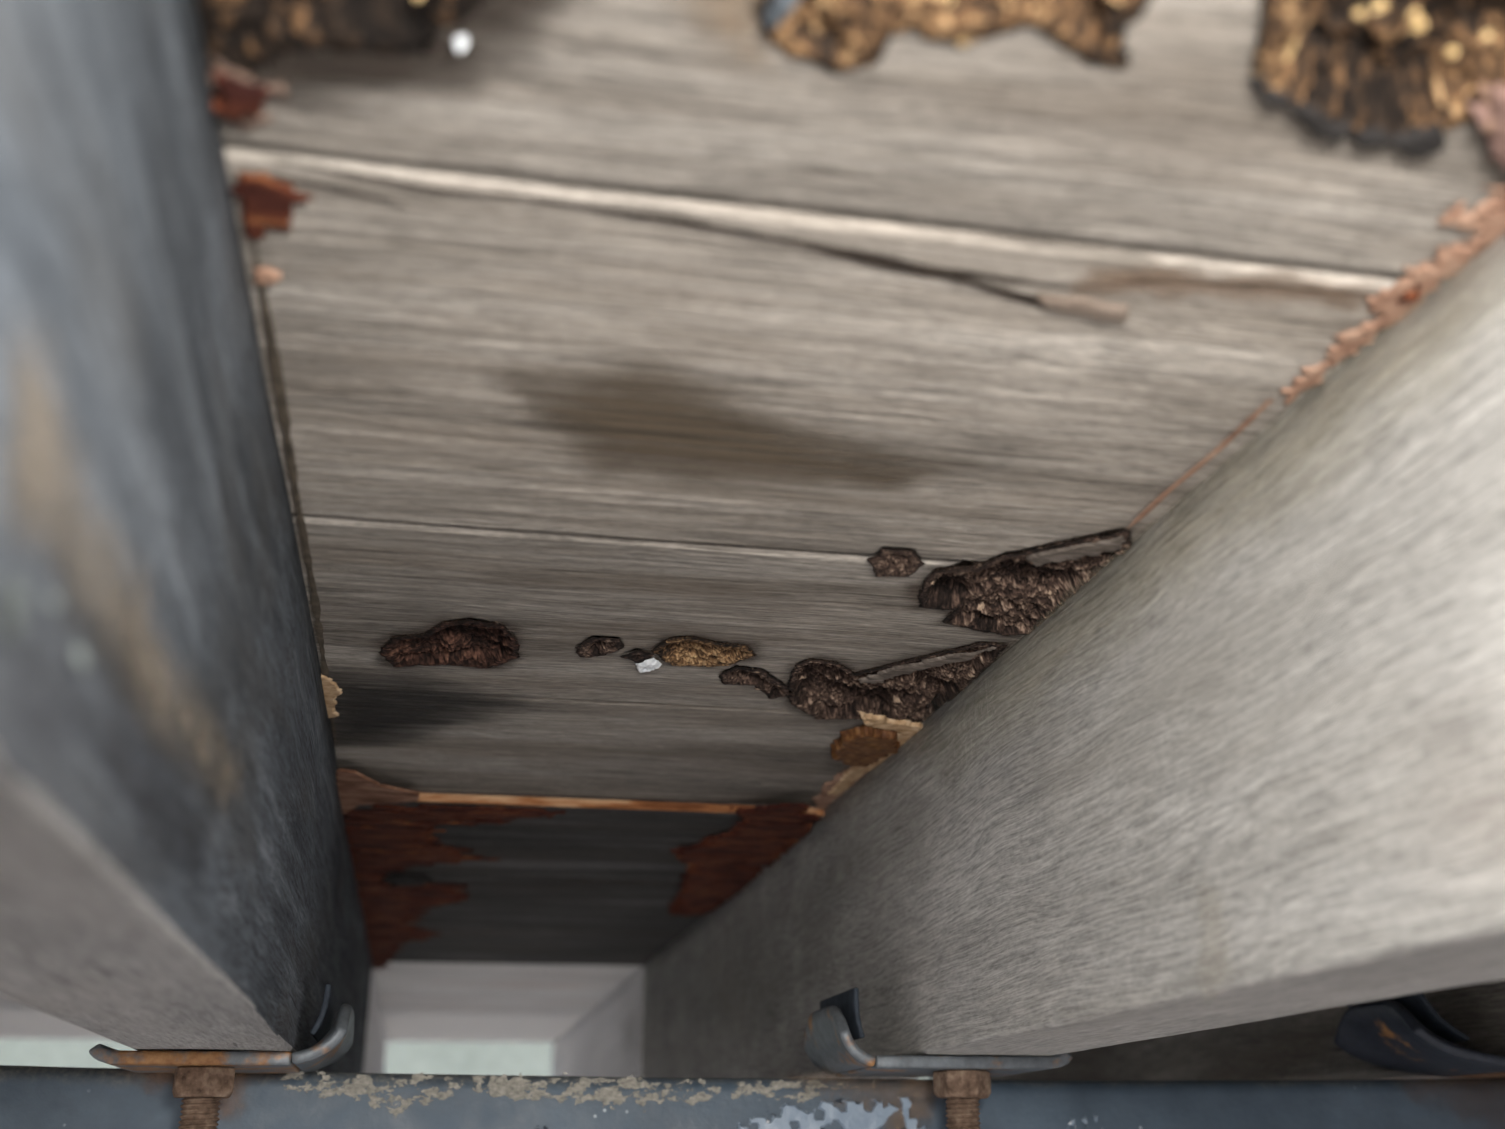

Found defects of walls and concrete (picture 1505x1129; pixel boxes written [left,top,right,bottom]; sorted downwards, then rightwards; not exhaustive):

spalling [762,0,800,29]
crack [237,154,1375,322]
water stain [512,366,927,485]
peeling [738,1096,925,1129]